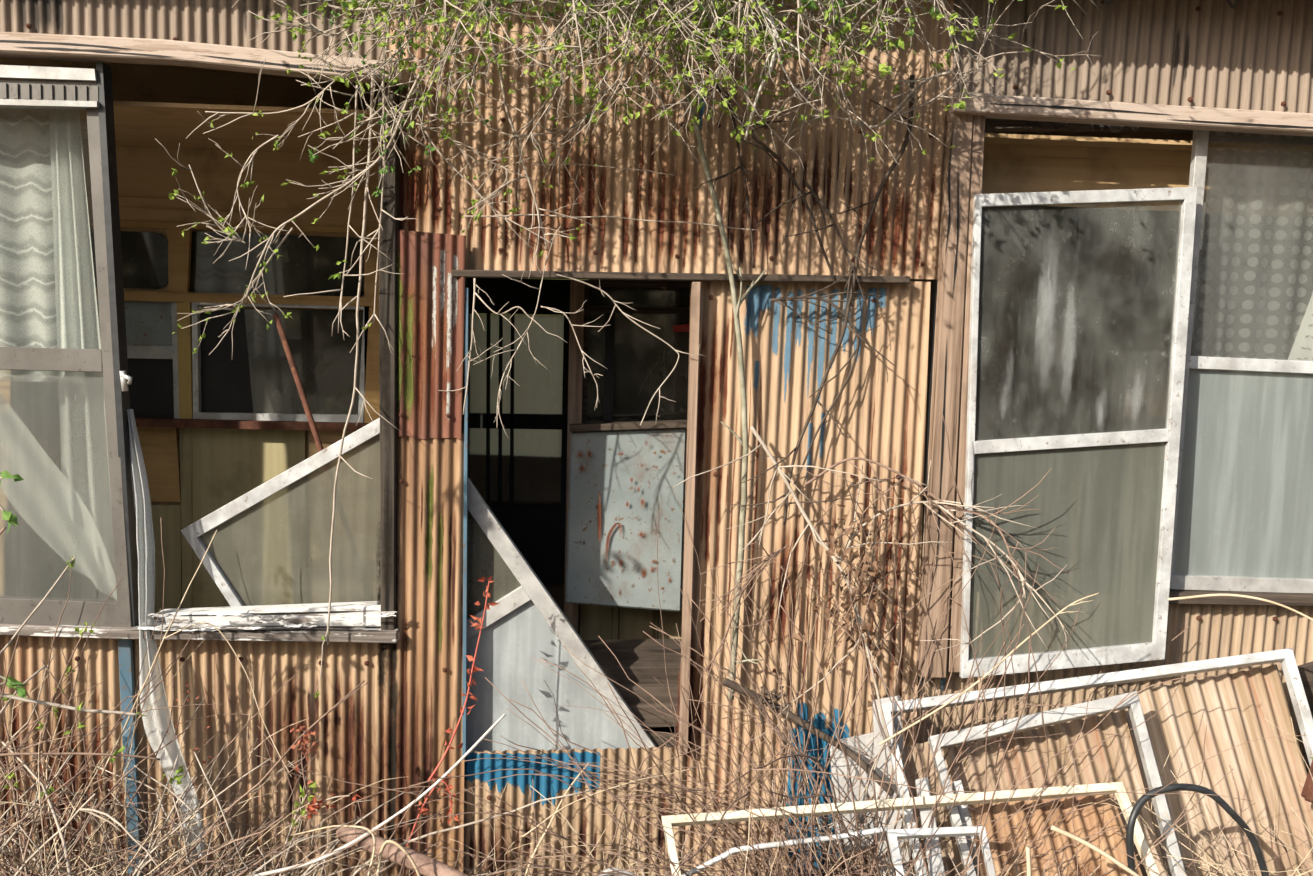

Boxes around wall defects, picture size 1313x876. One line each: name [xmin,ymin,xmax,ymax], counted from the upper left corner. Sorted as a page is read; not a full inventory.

corrosion [399,144,606,268]
corrosion [622,130,700,269]
corrosion [718,149,943,273]
peeling [432,250,458,414]
peeling [744,285,886,478]
peeling [137,612,320,631]
peeling [343,611,397,626]
corrosion [676,307,761,747]
corrosion [861,378,911,700]
corrosion [257,620,432,854]
peeling [464,751,600,807]
peeling [785,702,849,876]